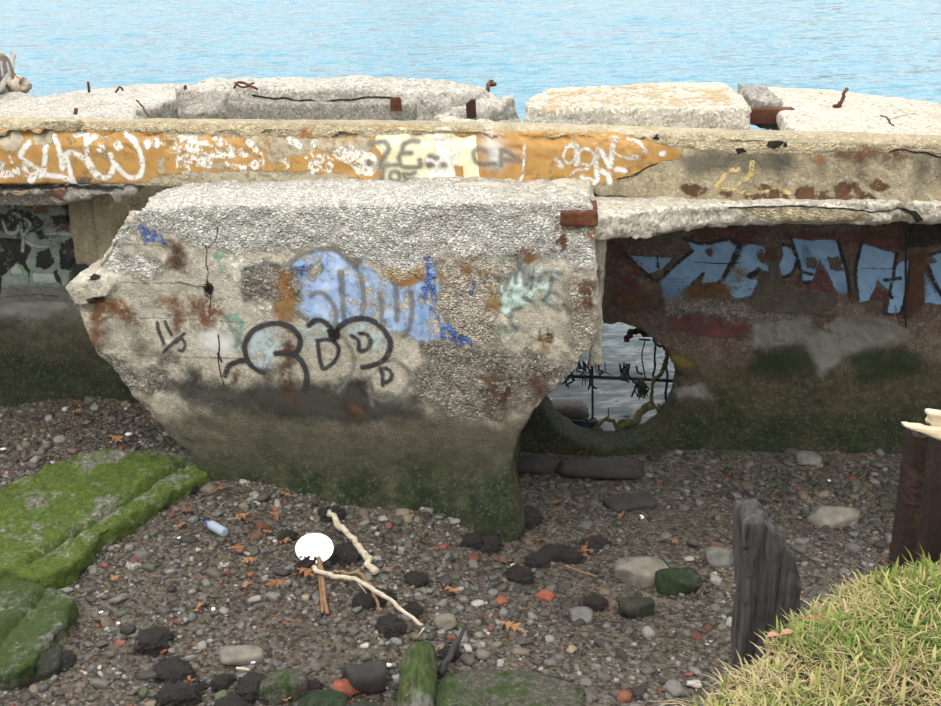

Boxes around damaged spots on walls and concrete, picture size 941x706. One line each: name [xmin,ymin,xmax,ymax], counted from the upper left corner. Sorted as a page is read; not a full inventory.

corrosion [681,184,708,197]
corrosion [720,178,889,200]
spalling [0,100,599,421]
spalling [623,328,651,342]
leakage [851,349,923,382]
leakage [174,366,422,425]